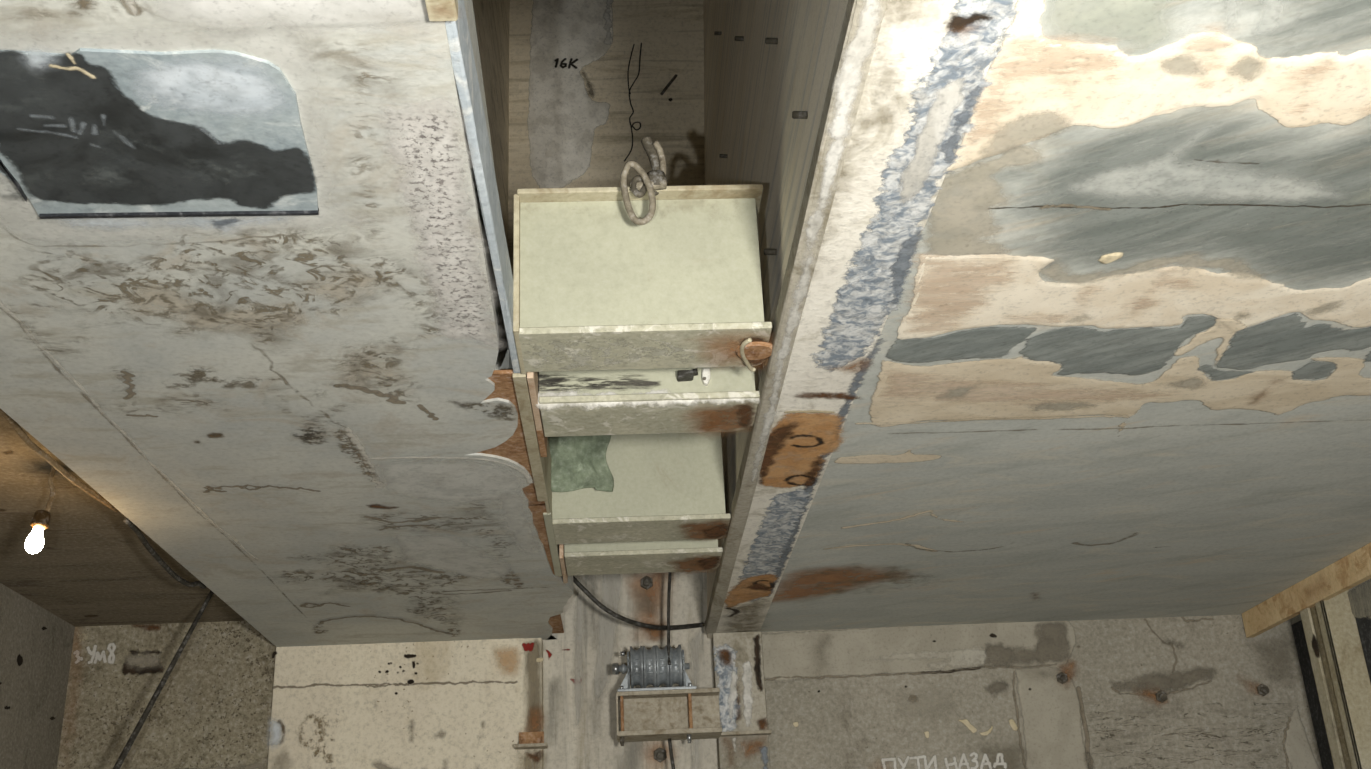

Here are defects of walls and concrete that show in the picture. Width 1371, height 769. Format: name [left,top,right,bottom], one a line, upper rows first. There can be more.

peeling [810,0,1371,431]
crack [988,203,1371,211]
leakage [77,236,415,341]
corrosion [703,405,752,431]
corrosion [759,393,858,488]
leakage [364,505,508,548]
leakage [284,547,467,635]
corrosion [724,569,894,608]